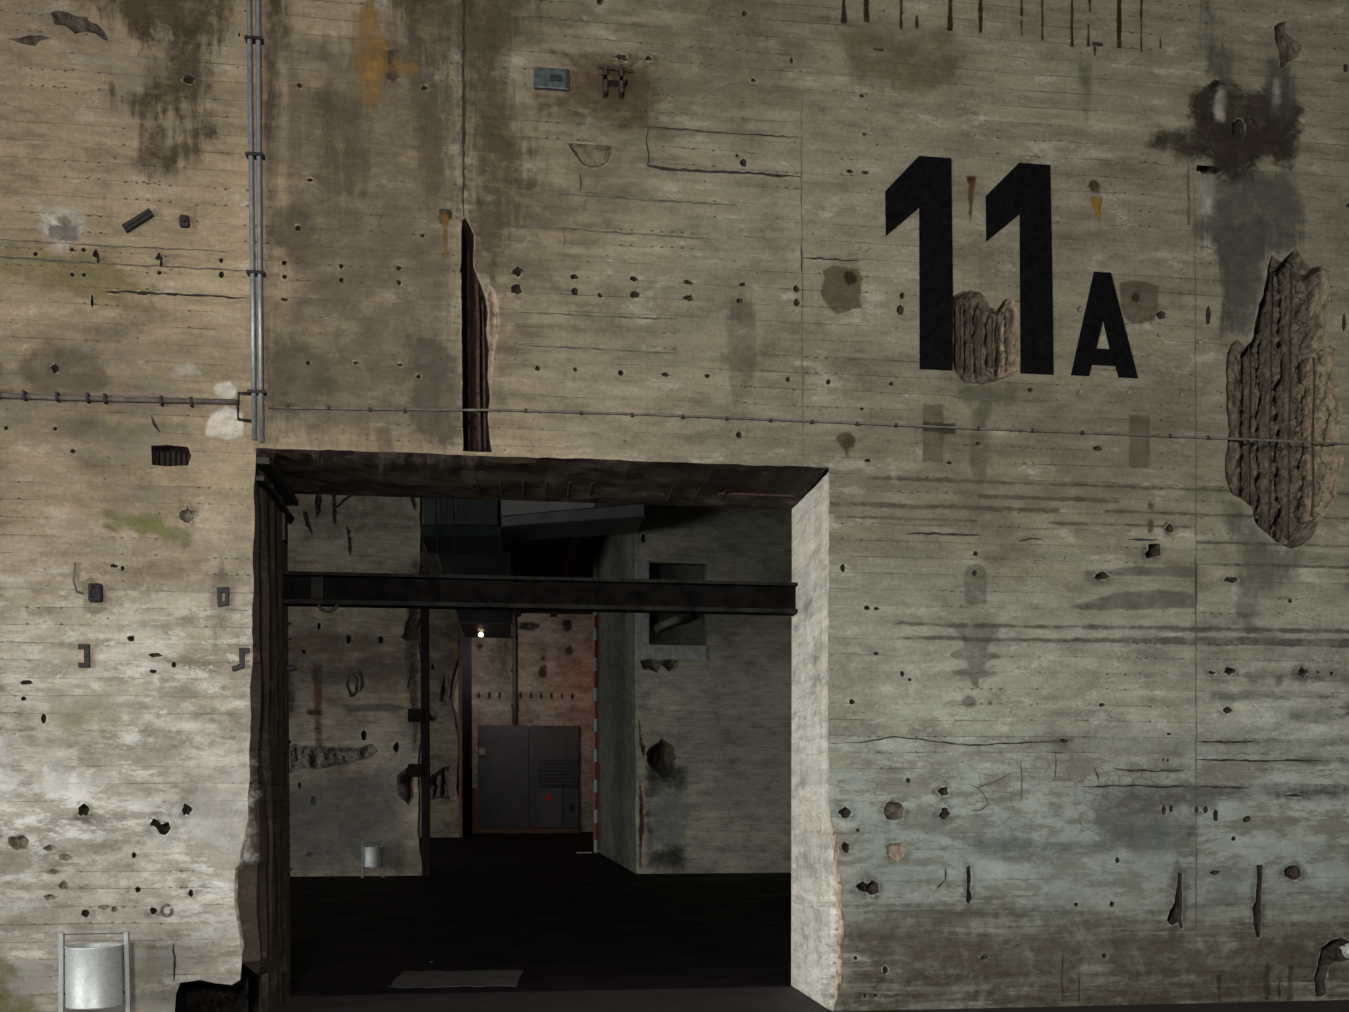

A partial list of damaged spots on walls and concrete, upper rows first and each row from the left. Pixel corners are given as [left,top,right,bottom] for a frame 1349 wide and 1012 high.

water stain [98,0,233,175]
water stain [1150,59,1303,335]
spalling [953,290,1019,385]
spalling [1225,249,1344,549]
spalling [1314,937,1349,997]